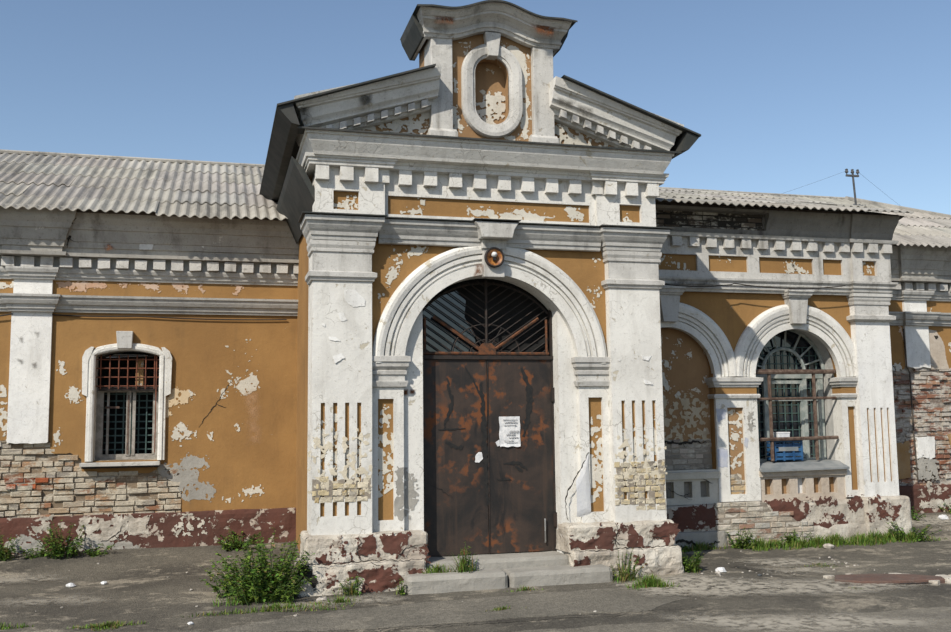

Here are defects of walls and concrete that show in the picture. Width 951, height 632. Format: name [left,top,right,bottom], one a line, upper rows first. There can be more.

peeling [475,90,506,124]
peeling [467,206,584,221]
peeling [56,280,161,293]
peeling [172,283,205,294]
flaking render [892,329,951,509]
flaking render [0,385,264,555]
crack [664,439,707,447]
flaking render [569,339,901,567]
flaking render [298,404,431,593]